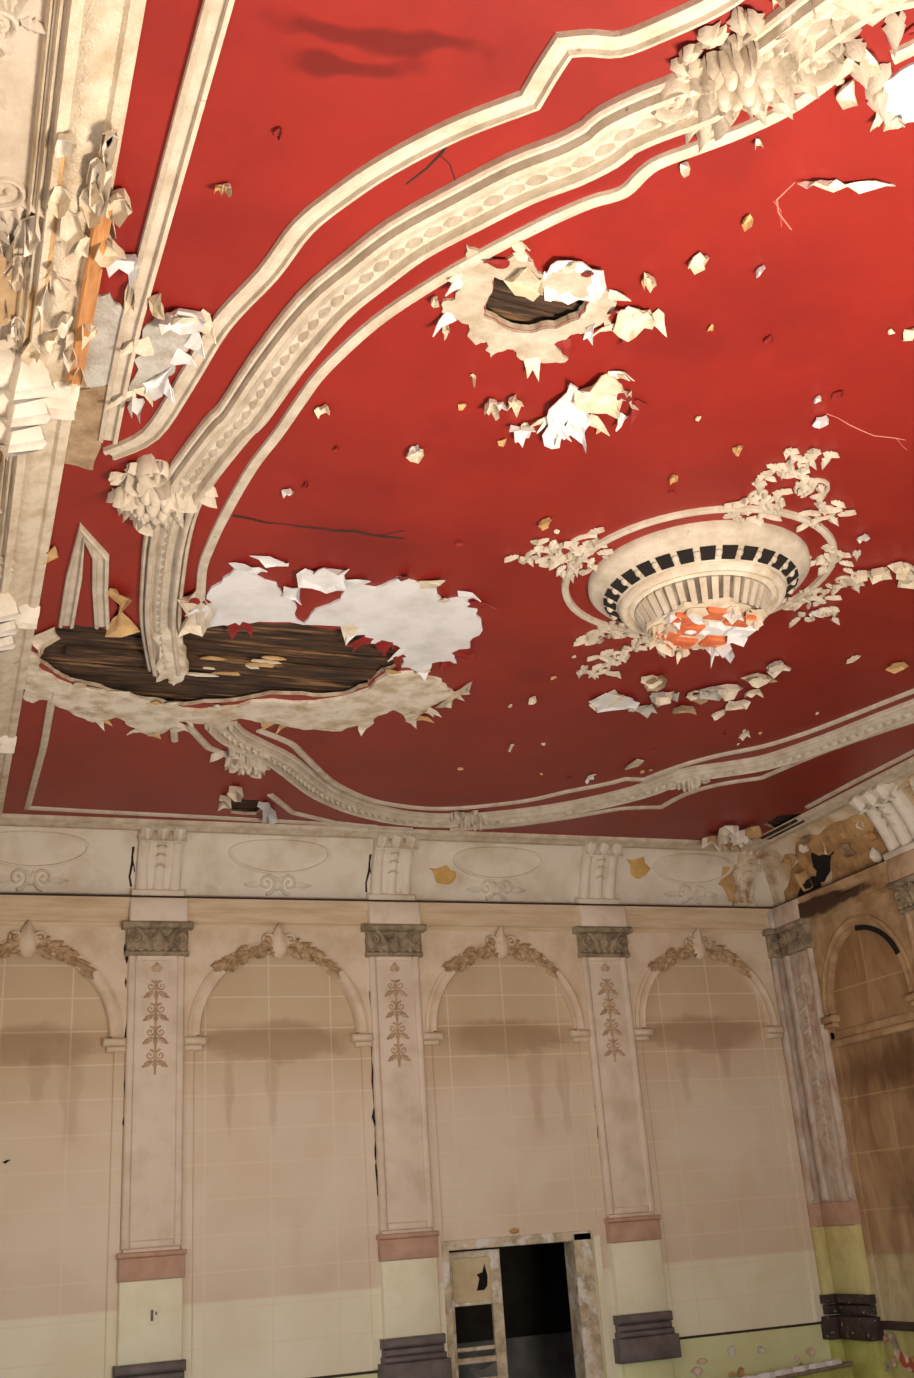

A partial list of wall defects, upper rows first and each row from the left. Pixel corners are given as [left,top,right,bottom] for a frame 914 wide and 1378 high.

peeling [835,49,914,132]
flaking render [0,129,216,470]
flaking render [431,241,667,381]
peeling [688,252,709,275]
peeling [888,328,914,341]
peeling [406,444,424,463]
peeling [484,371,647,453]
peeling [812,391,844,429]
flaking render [14,556,497,739]
flaking render [645,597,767,666]
flaking render [589,661,791,745]
flaking render [702,810,901,907]